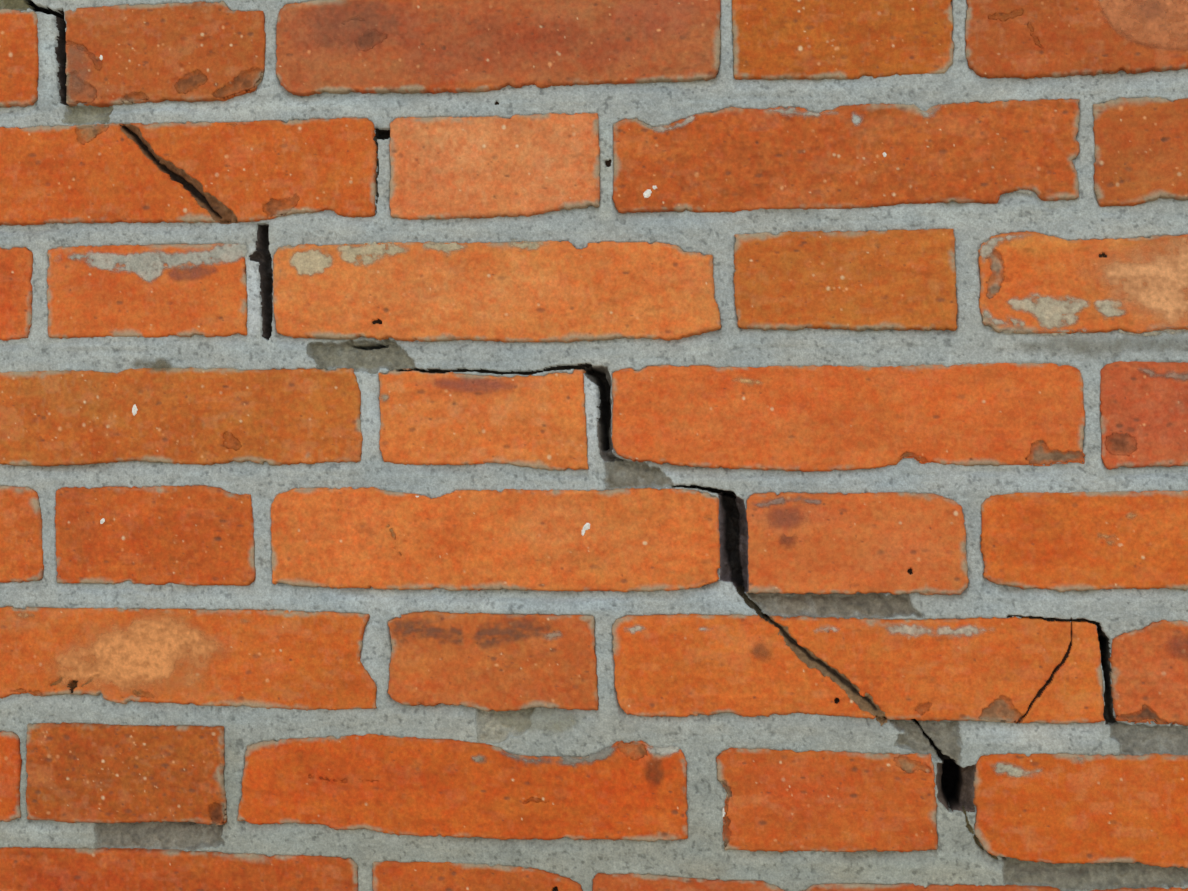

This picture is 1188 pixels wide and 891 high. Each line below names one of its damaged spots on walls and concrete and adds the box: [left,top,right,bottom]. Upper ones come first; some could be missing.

crack [28,0,69,106]
crack [372,137,380,215]
crack [120,124,273,341]
spalling [985,250,1004,299]
peeling [307,339,418,374]
crack [356,345,622,461]
crack [673,485,998,860]
crack [1007,615,1117,725]